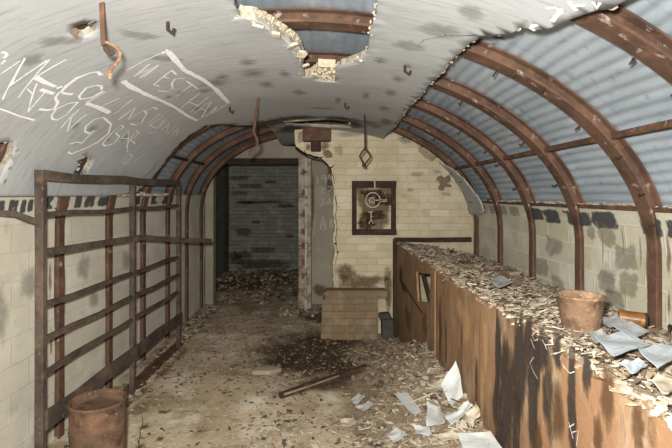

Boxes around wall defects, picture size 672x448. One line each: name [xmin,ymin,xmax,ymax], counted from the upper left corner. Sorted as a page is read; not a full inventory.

spalling [70,21,97,38]
spalling [233,4,342,81]
crack [295,147,338,278]
peeling [417,144,485,215]
damp [338,266,391,306]